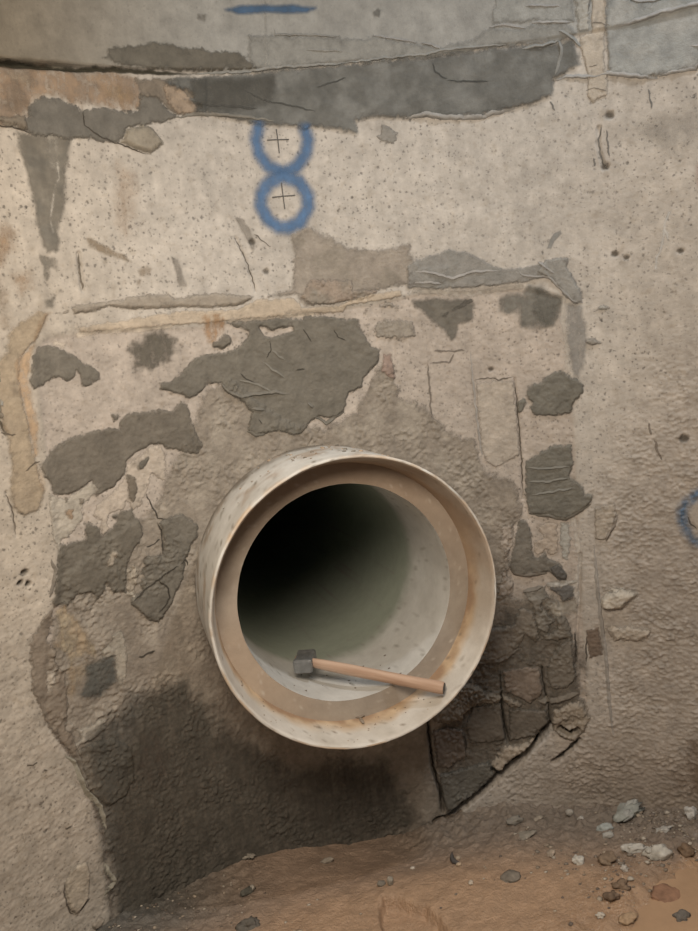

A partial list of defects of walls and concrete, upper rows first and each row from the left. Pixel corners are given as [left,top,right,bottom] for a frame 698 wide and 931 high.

crack [0,60,180,75]
peeling [164,84,310,114]
peeling [120,124,164,154]
spalling [127,565,139,597]
spalling [73,593,97,614]
crack [499,673,507,733]
crack [541,670,550,719]
crack [427,721,442,803]